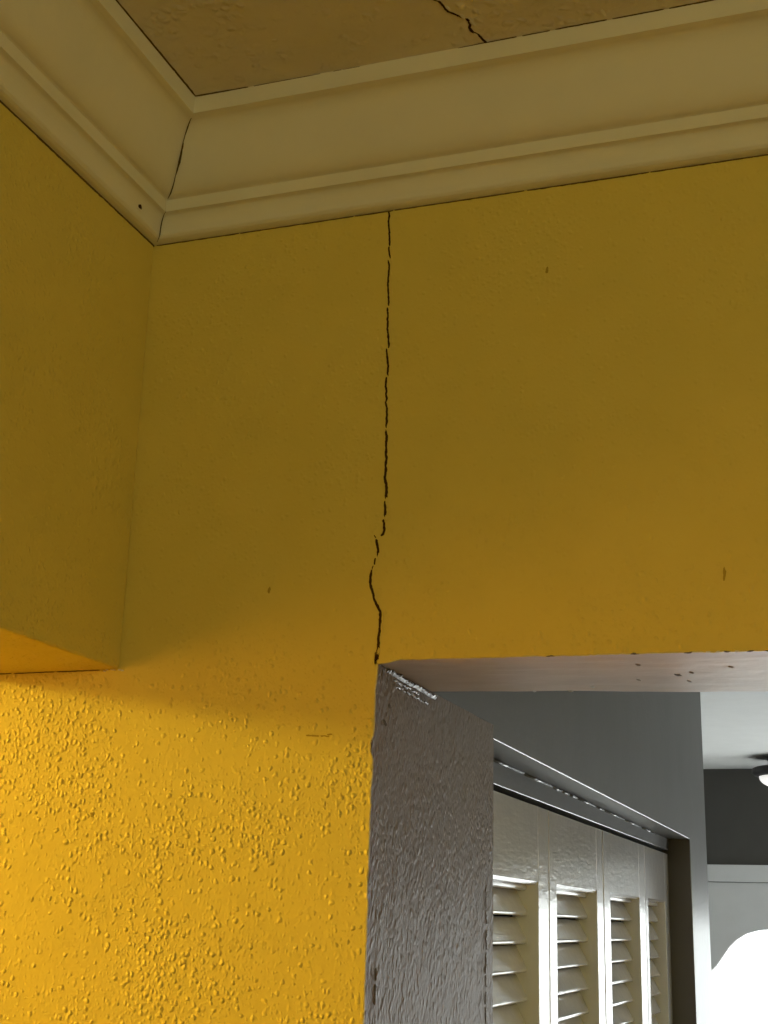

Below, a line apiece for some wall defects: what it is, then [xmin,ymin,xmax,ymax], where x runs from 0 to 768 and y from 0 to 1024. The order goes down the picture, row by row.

crack [434,0,487,43]
crack [157,119,191,241]
crack [369,212,393,661]